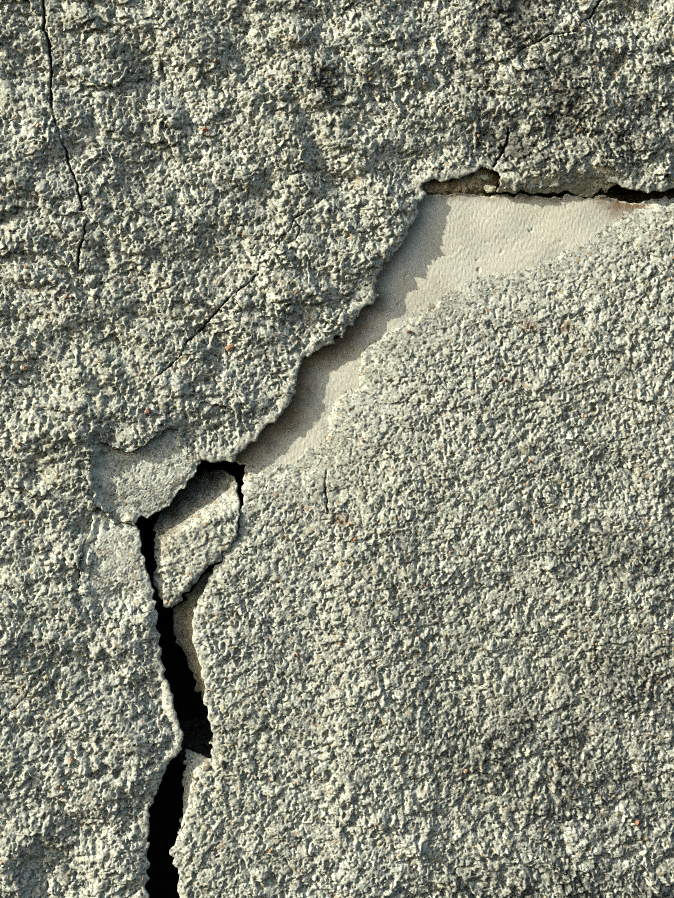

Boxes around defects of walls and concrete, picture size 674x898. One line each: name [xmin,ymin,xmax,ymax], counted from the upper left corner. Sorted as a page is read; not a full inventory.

crack [43,0,89,264]
crack [422,129,674,203]
crack [518,0,601,52]
crack [158,266,259,375]
spalling [234,193,646,468]
crack [135,460,245,898]